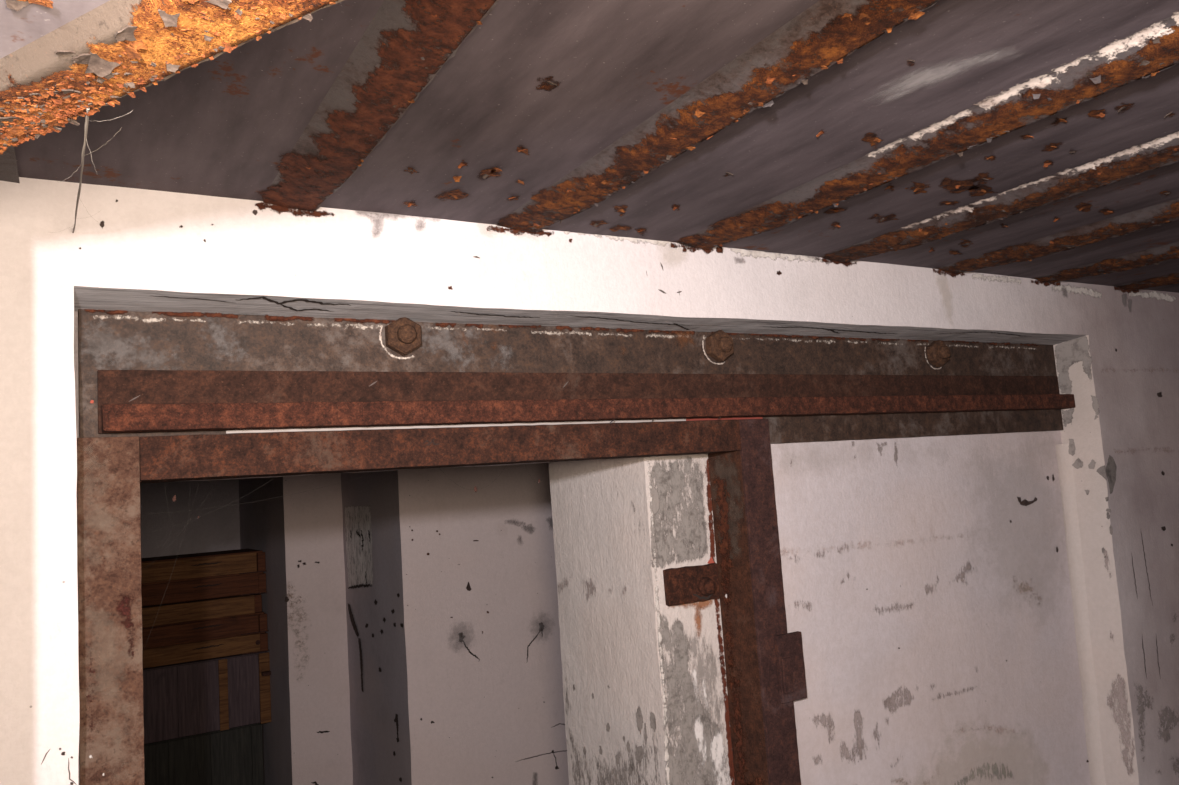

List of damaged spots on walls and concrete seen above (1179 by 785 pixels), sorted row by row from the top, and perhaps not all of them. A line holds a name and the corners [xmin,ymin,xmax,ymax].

rust [0,0,338,150]
rust [255,0,496,217]
rust [487,0,938,237]
rust [671,24,1179,277]
crack [161,296,351,311]
rust [556,326,695,335]
peeling [1055,336,1092,394]
rust [1031,246,1179,293]
rust [705,460,715,563]
spalling [1061,408,1117,535]
spalling [569,457,727,785]
rust [679,599,735,785]